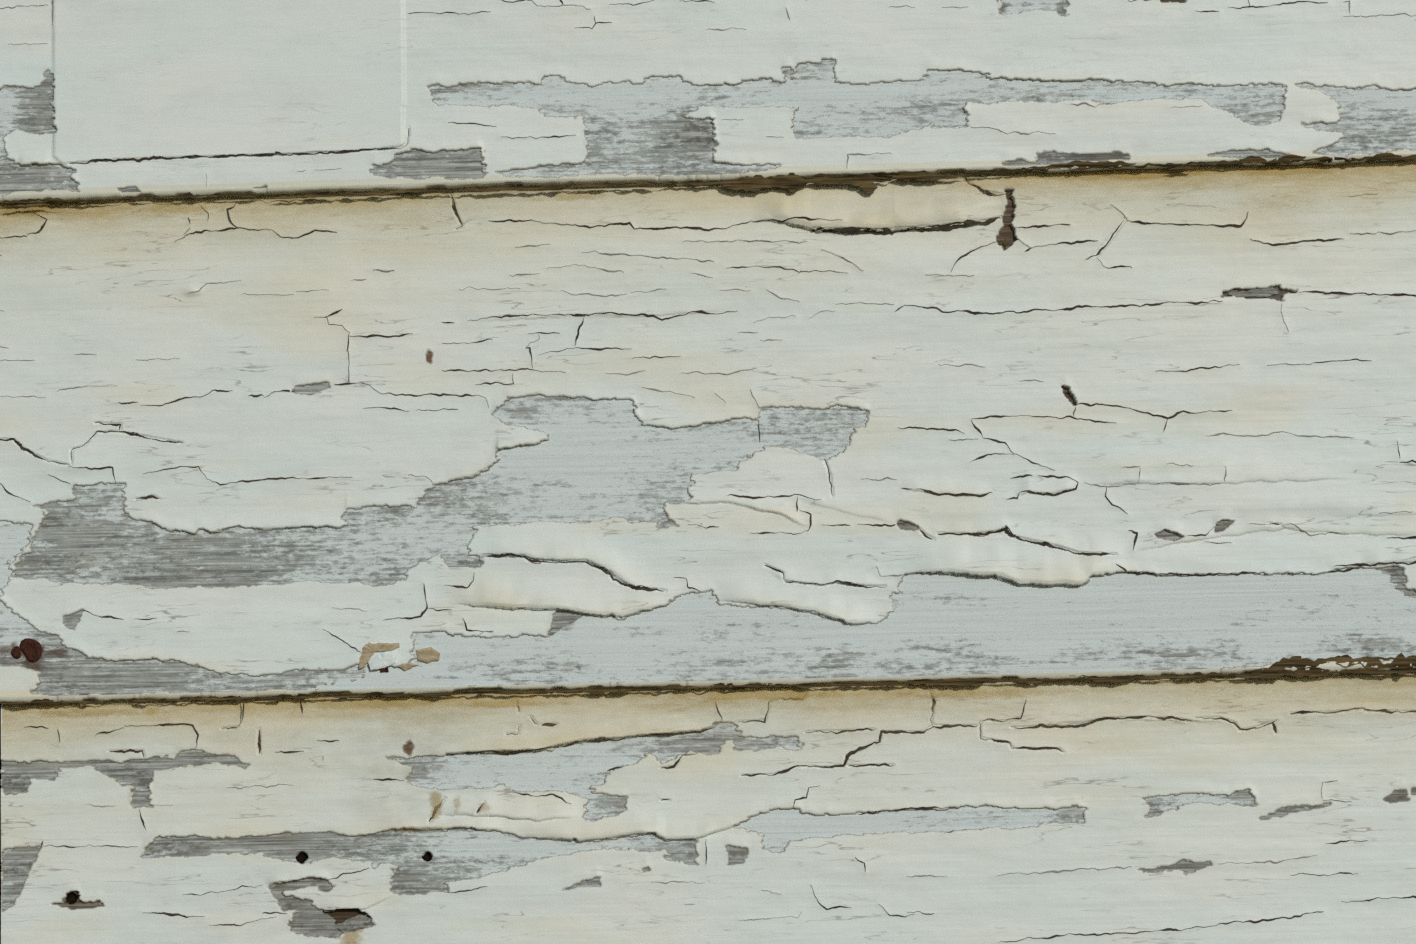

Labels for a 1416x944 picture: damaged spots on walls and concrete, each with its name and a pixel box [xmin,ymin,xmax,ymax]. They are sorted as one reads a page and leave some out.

peeling [0,71,78,196]
peeling [370,60,1416,180]
crack [191,177,1416,442]
crack [0,389,350,502]
peeling [0,395,1416,696]
crack [729,403,1416,588]
peeling [1,750,247,808]
crack [97,700,339,789]
peeling [142,723,803,937]
crack [447,690,1416,807]
spalling [54,891,103,909]
crack [997,840,1416,943]